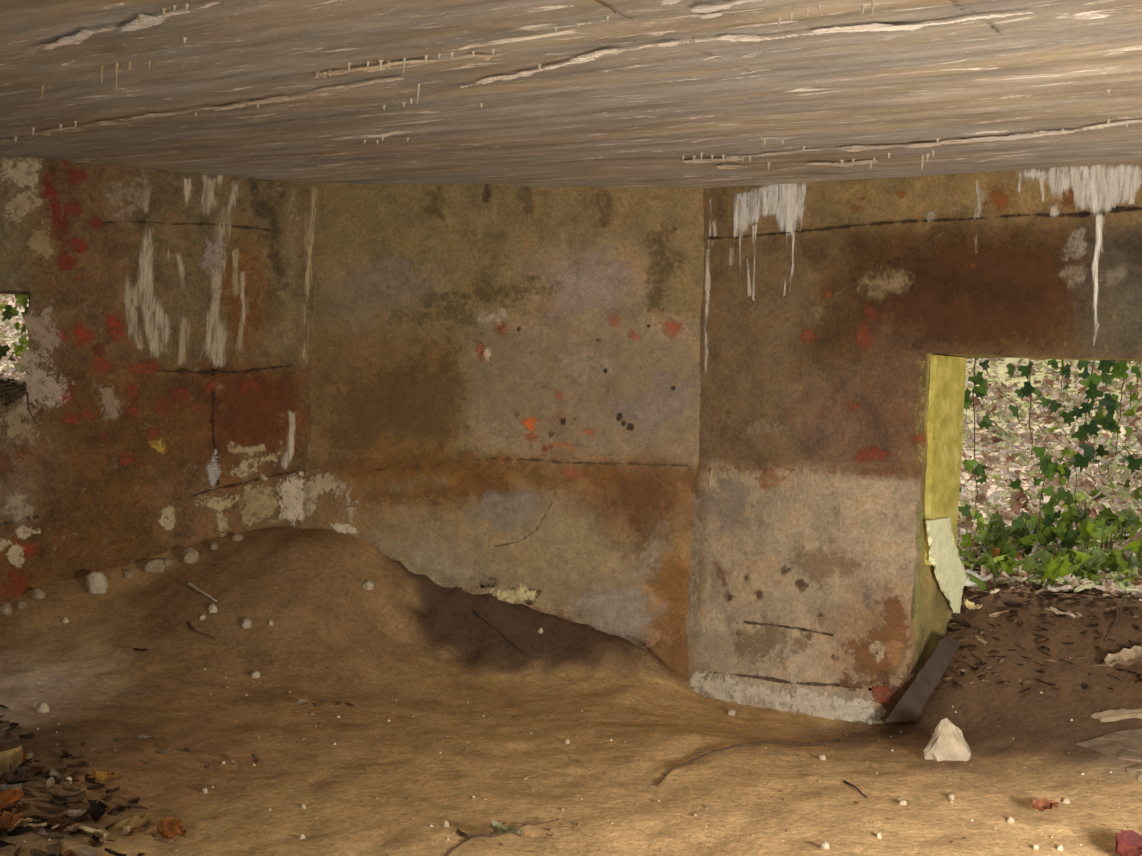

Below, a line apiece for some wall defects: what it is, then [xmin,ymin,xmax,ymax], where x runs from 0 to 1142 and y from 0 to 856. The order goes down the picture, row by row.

water stain [124,175,296,481]
water stain [251,178,681,361]
water stain [729,183,806,300]
water stain [682,121,1142,169]
crack [708,206,1142,240]
water stain [854,164,1142,462]
water stain [303,341,468,534]